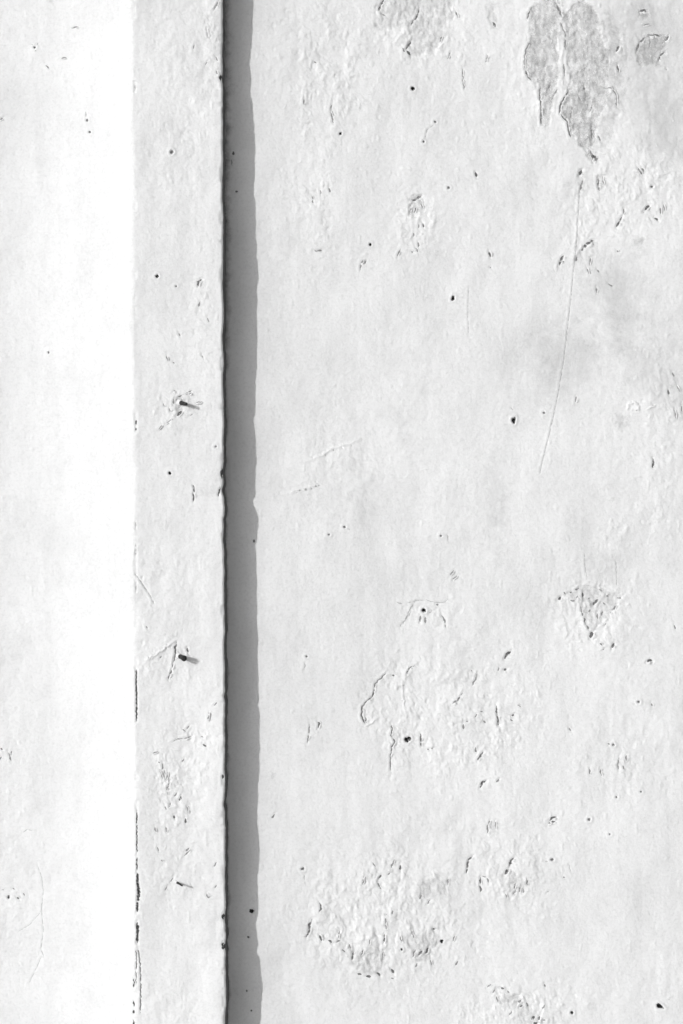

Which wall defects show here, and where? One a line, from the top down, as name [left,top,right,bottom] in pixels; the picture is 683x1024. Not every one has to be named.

peeling [636,9,671,69]
peeling [524,44,585,137]
crack [361,666,416,771]